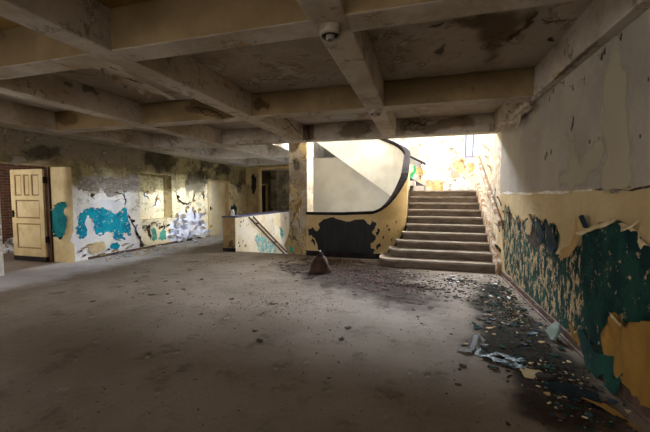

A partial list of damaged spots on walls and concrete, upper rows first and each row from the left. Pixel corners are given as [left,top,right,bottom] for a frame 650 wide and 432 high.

damp [461,12,537,59]
crack [115,192,146,247]
flaking render [50,173,212,258]
peeling [485,185,650,408]